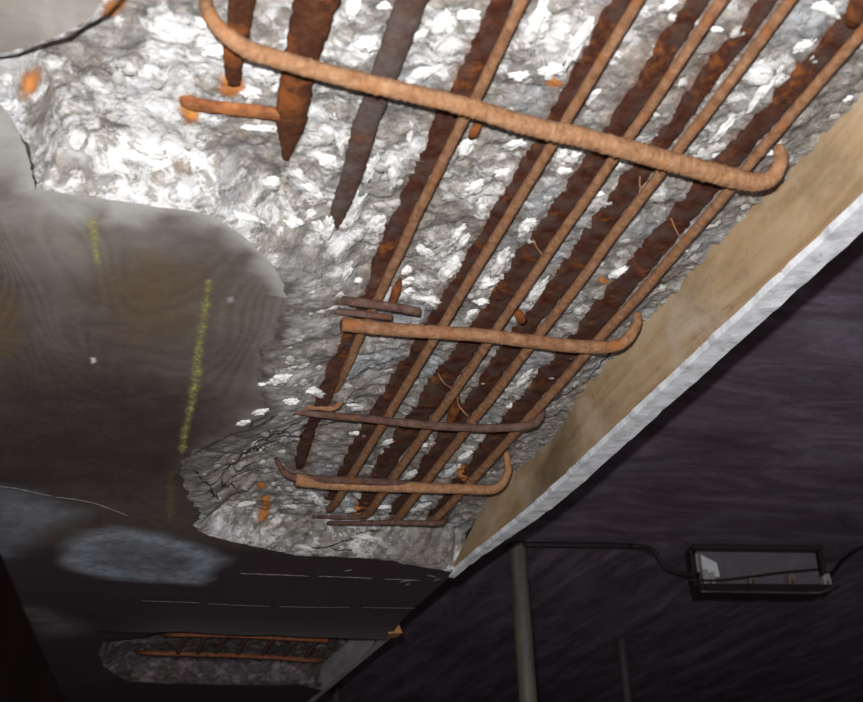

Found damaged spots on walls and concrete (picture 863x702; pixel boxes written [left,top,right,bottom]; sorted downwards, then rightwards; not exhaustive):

spalling [571,0,686,132]
corrosion [603,0,710,137]
spalling [634,0,849,161]
corrosion [712,14,858,168]
spalling [0,0,635,572]
corrosion [354,109,459,319]
corrosion [469,152,609,329]
corrosion [511,163,654,334]
spalling [537,168,694,338]
corrosion [567,180,721,340]
spalling [602,40,863,341]
crack [192,414,301,499]